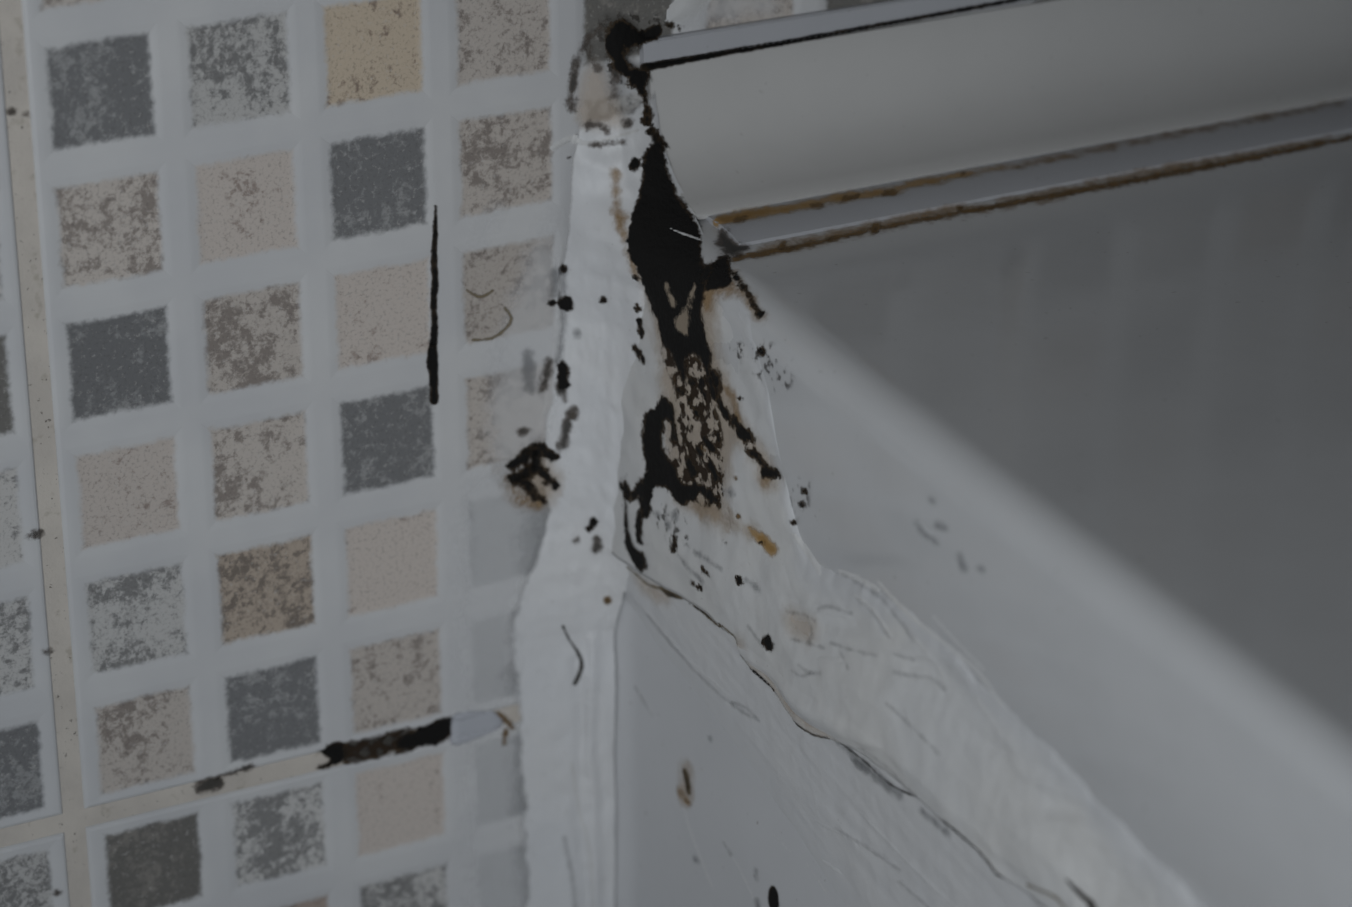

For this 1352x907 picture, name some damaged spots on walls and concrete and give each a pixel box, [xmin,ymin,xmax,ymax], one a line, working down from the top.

crack [426,205,513,405]
leakage [548,295,573,311]
leakage [566,0,1020,574]
leakage [505,358,578,507]
crack [627,567,774,692]
peeling [733,640,883,751]
crack [793,721,915,797]
spalling [768,886,779,907]
crack [939,819,1095,907]